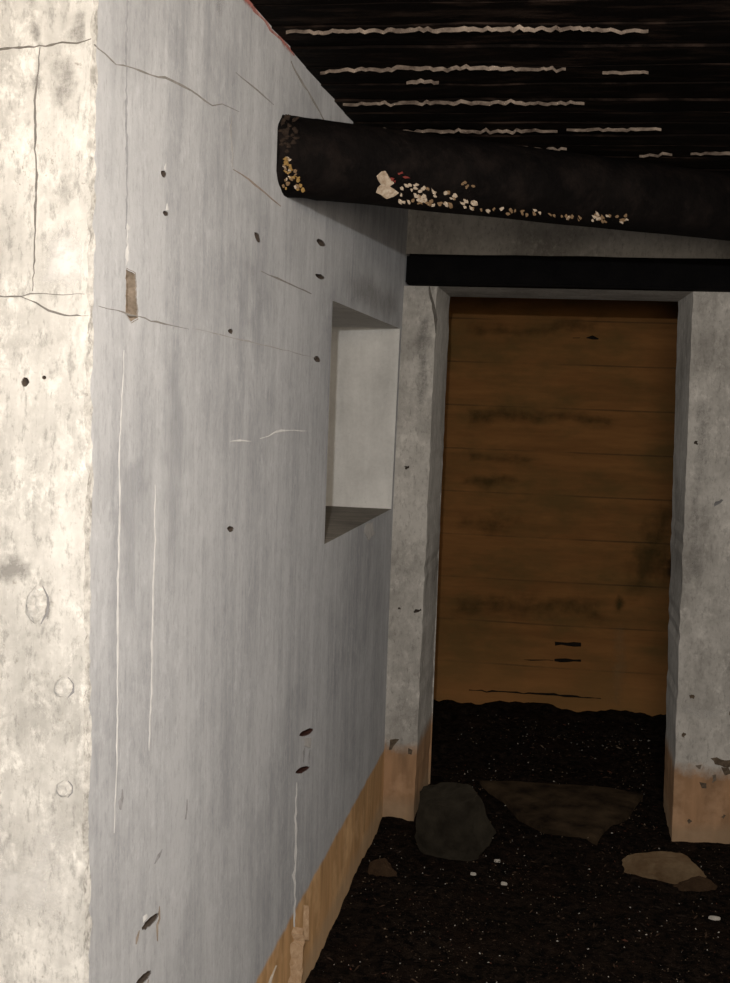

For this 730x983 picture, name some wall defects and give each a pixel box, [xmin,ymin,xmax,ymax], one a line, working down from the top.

crack [0,0,314,358]
peeling [376,171,628,224]